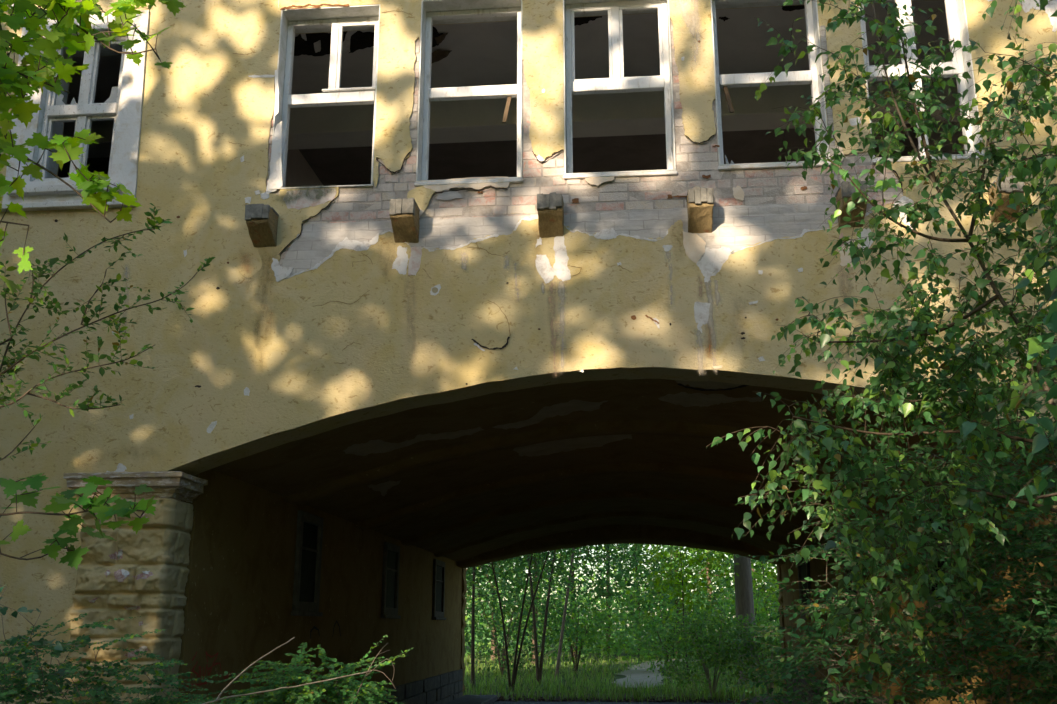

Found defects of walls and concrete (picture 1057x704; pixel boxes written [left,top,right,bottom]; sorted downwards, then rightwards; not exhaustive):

peeling [1020,0,1057,32]
spalling [245,19,914,283]